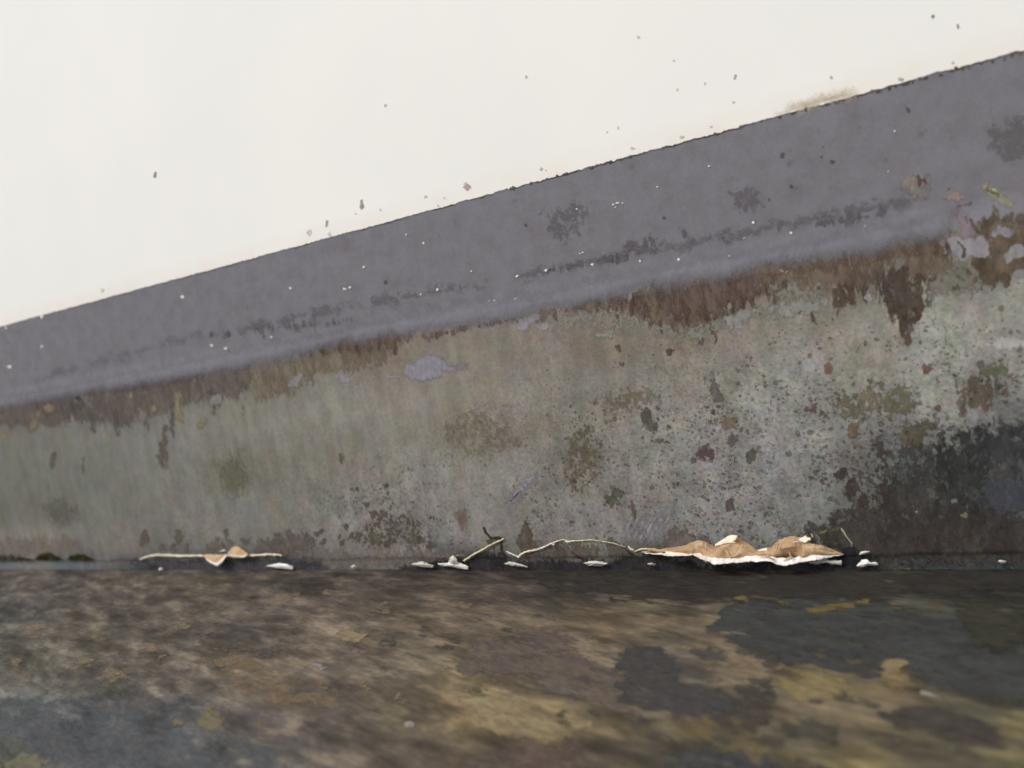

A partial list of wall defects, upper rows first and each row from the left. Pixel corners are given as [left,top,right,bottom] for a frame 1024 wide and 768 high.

rust [536,205,1024,345]
peeling [927,187,1024,301]
damp [804,416,1024,570]
peeling [139,546,293,570]
peeling [438,535,844,569]